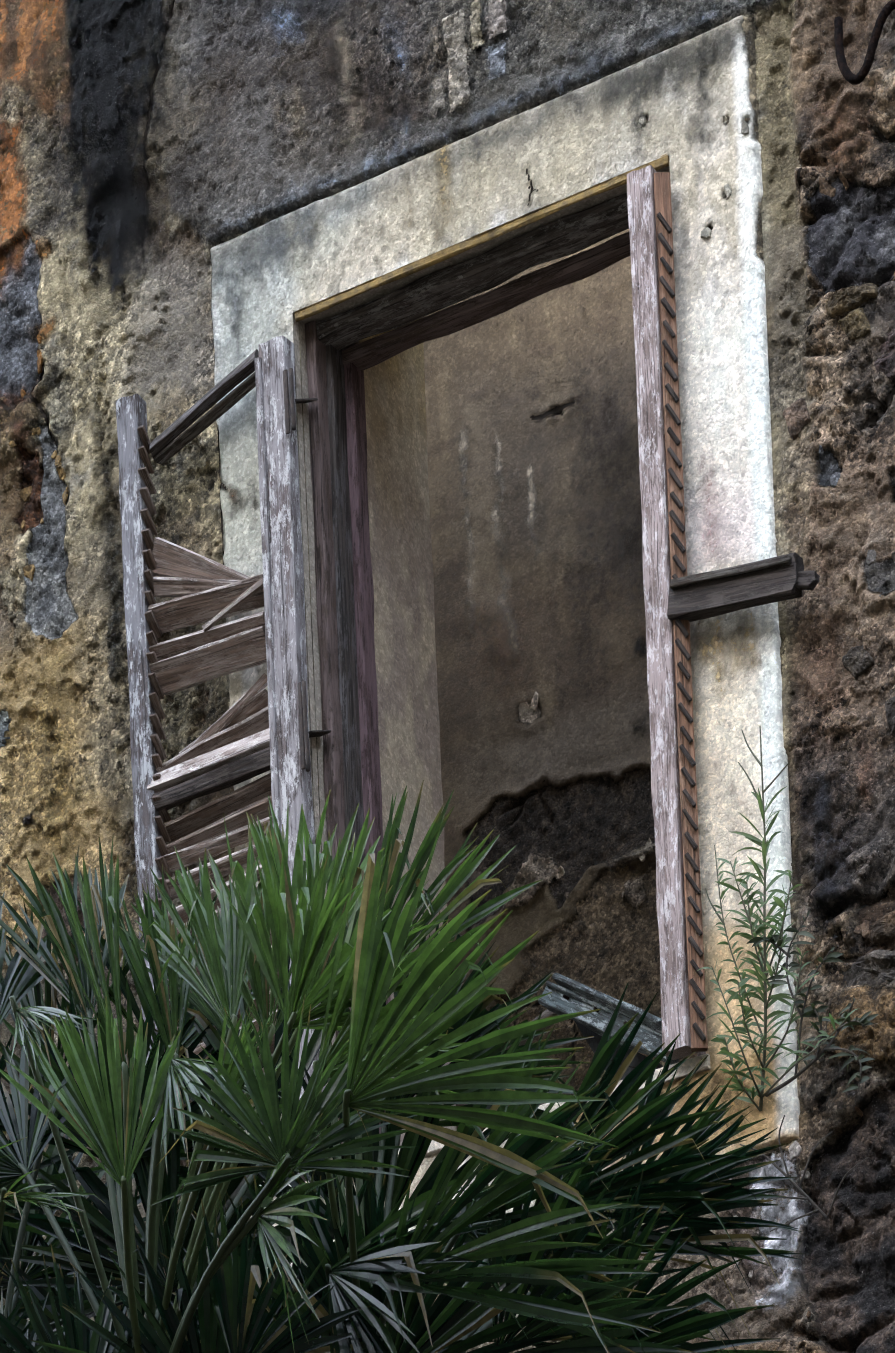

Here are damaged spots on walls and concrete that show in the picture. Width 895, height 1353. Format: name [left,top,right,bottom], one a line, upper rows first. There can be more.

rust [0,0,68,114]
rust [0,119,51,277]
leakage [65,0,166,311]
spalling [805,173,895,294]
spalling [817,445,842,488]
flaking render [9,424,78,640]
spalling [863,550,895,597]
flaking render [464,768,662,1106]
spalling [853,884,895,955]
crack [494,994,540,1026]
crack [569,1019,578,1061]
spalling [723,1086,895,1353]